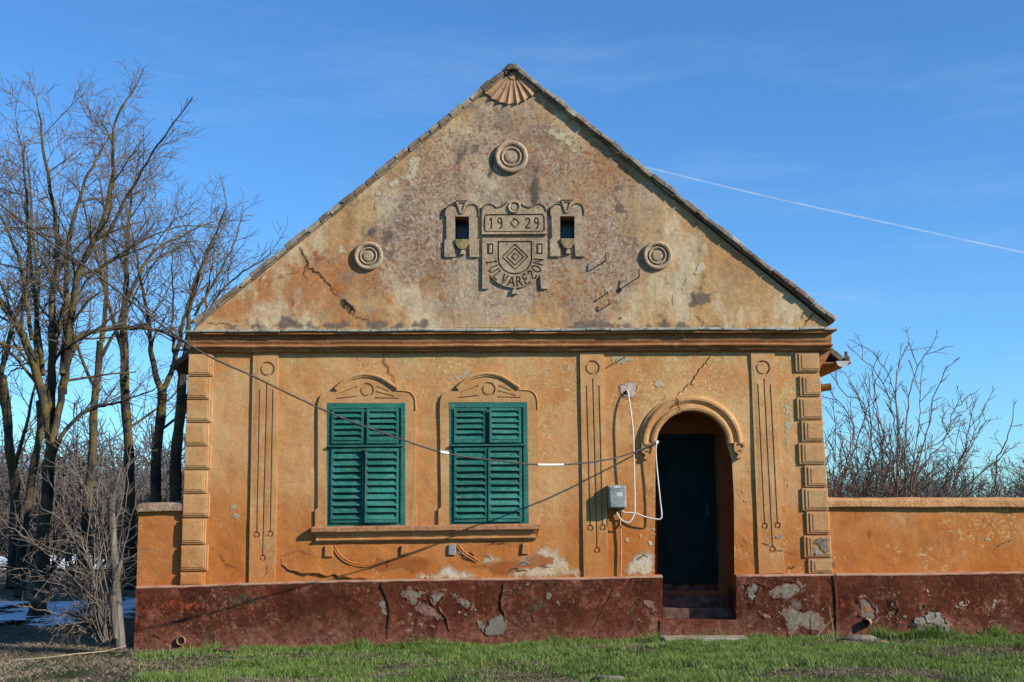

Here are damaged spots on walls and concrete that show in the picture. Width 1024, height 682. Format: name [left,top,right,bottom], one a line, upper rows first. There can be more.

crack [297,245,370,324]
crack [675,356,712,411]
crack [380,547,451,640]
spalling [399,542,509,637]
crack [499,583,534,623]
peeling [508,548,579,577]
peeling [625,528,656,575]
spalling [741,579,826,638]
spalling [812,537,846,559]
spalling [840,590,970,635]